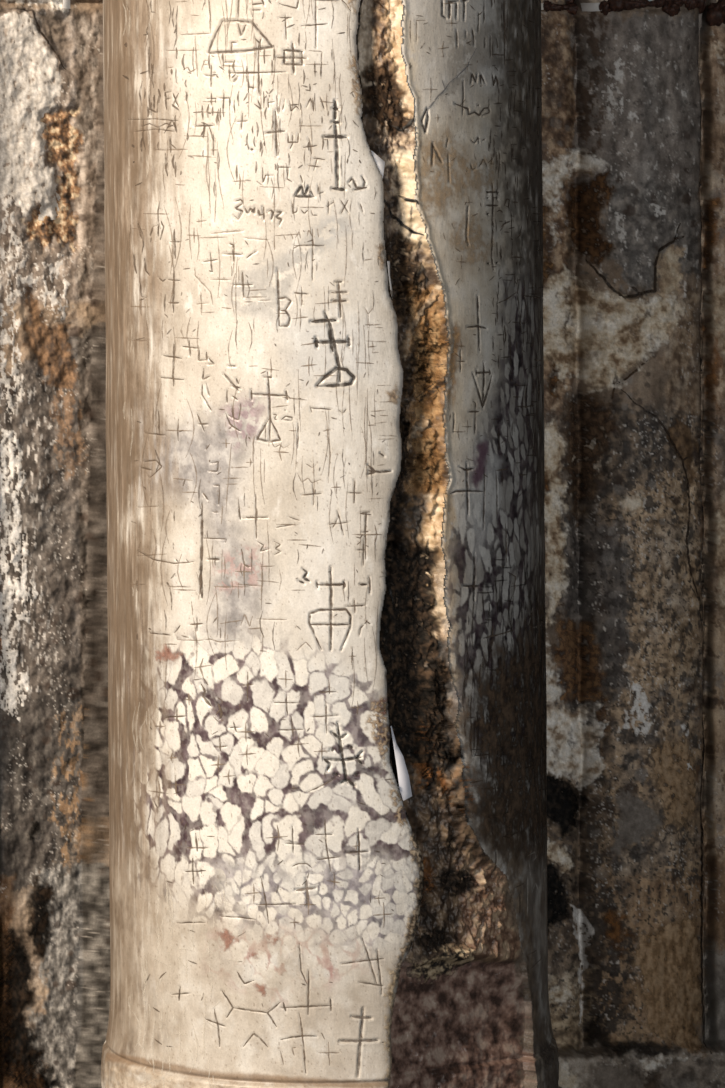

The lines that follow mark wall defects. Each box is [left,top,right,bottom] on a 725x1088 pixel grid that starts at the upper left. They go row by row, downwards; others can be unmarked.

crack [355,0,363,84]
corrosion [543,0,578,15]
corrosion [599,0,725,26]
crack [392,48,477,131]
crack [384,195,424,235]
crack [586,182,702,386]
crack [612,360,704,627]
crack [385,564,394,605]
crack [390,746,408,819]
crack [700,664,712,1054]
leakage [0,881,54,1088]